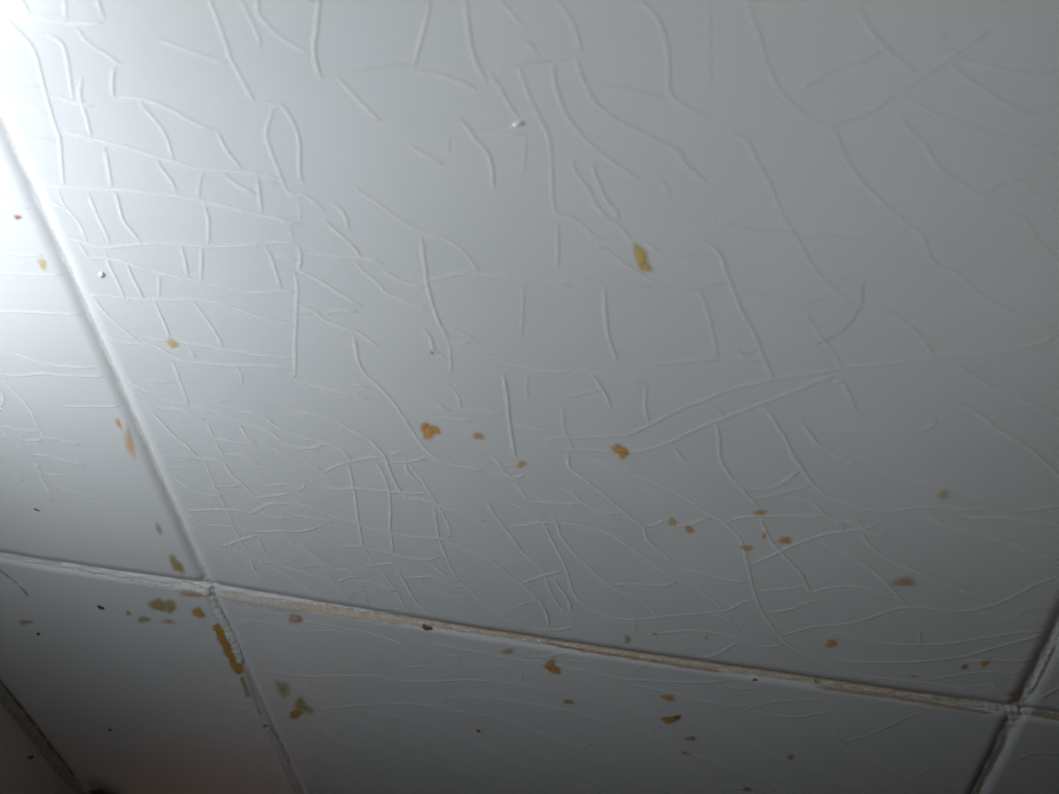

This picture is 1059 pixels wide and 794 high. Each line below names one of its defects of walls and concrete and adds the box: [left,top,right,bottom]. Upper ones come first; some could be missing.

corrosion [422,423,439,438]
corrosion [612,445,627,458]
corrosion [150,600,175,612]
corrosion [183,591,204,617]
corrosion [213,624,243,674]